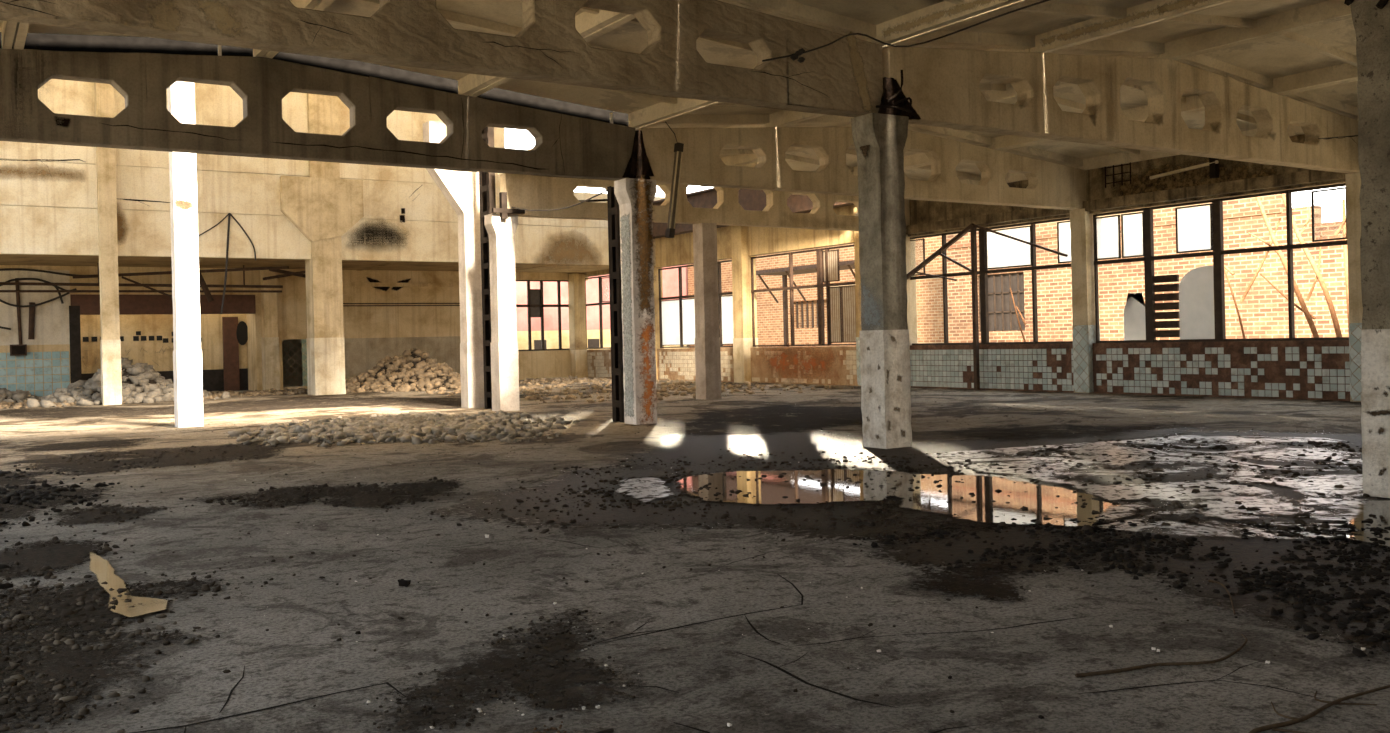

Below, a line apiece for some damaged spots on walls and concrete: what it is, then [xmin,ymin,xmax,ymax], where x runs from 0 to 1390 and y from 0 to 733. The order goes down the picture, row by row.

rust [638,318,658,425]